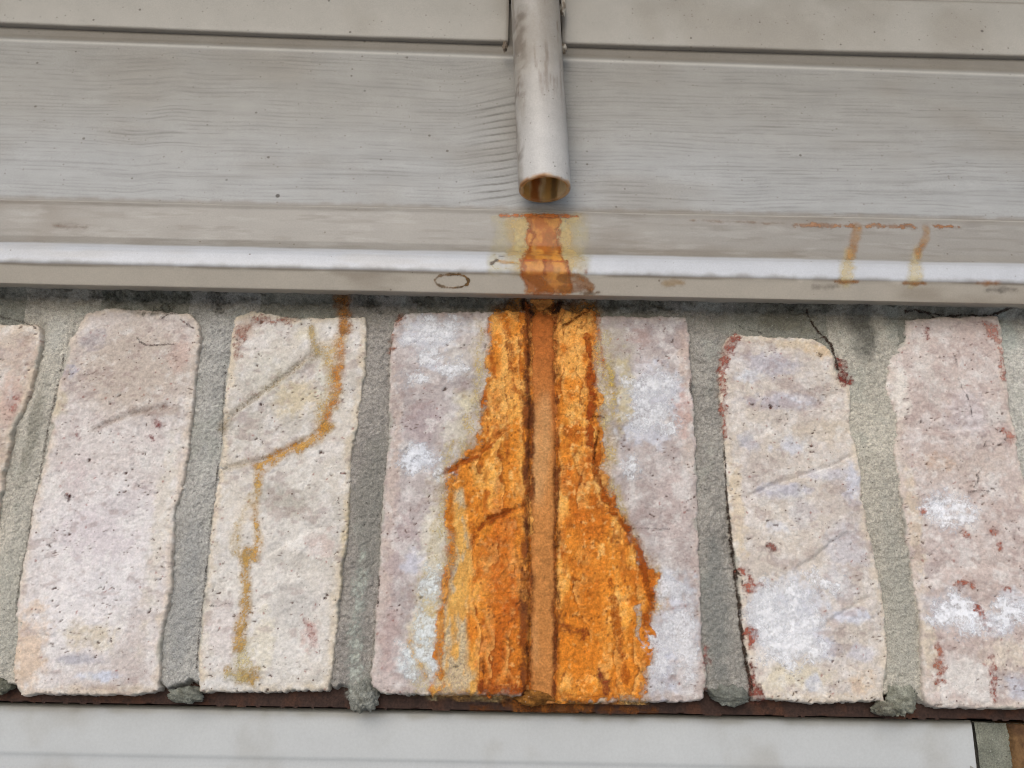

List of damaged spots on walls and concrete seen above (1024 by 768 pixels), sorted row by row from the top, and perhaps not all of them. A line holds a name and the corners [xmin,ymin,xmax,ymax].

corrosion [224,294,351,685]
corrosion [409,213,661,713]
crack [806,309,839,371]
corrosion [800,222,916,283]